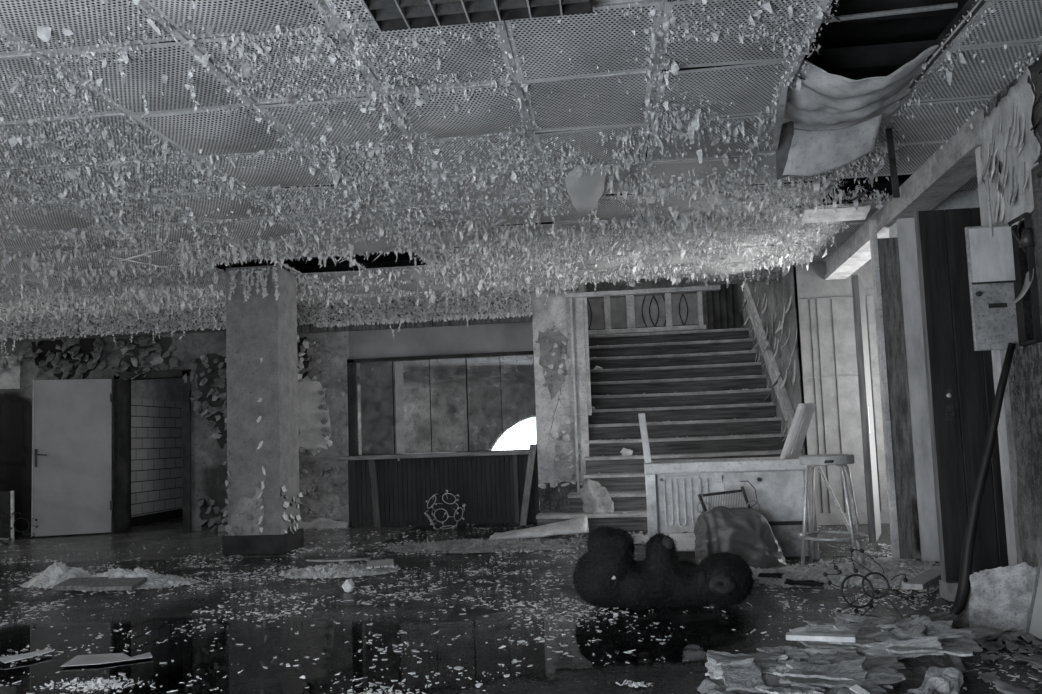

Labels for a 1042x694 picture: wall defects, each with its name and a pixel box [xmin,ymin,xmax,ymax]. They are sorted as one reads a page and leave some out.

peeling [0,0,1000,441]
peeling [0,335,684,694]
peeling [777,524,893,569]
peeling [747,577,954,640]
peeling [962,643,1042,690]